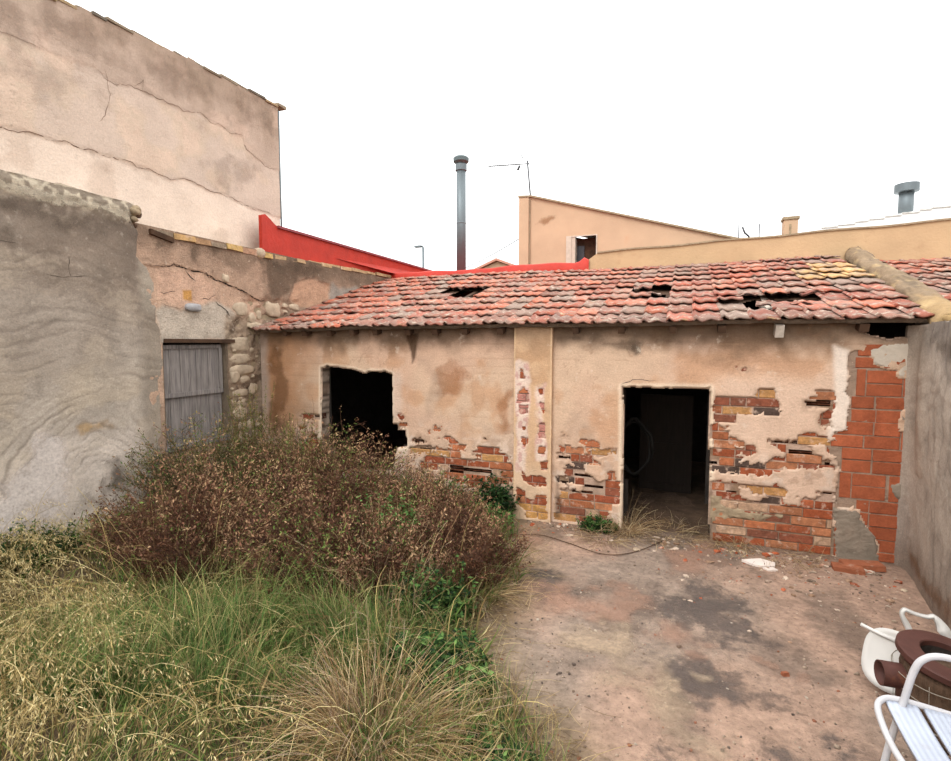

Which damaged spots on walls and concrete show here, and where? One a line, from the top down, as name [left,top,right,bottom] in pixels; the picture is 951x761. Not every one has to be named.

crack [102,71,272,169]
crack [154,263,263,315]
flaking render [401,369,620,522]
flaking render [709,390,836,555]